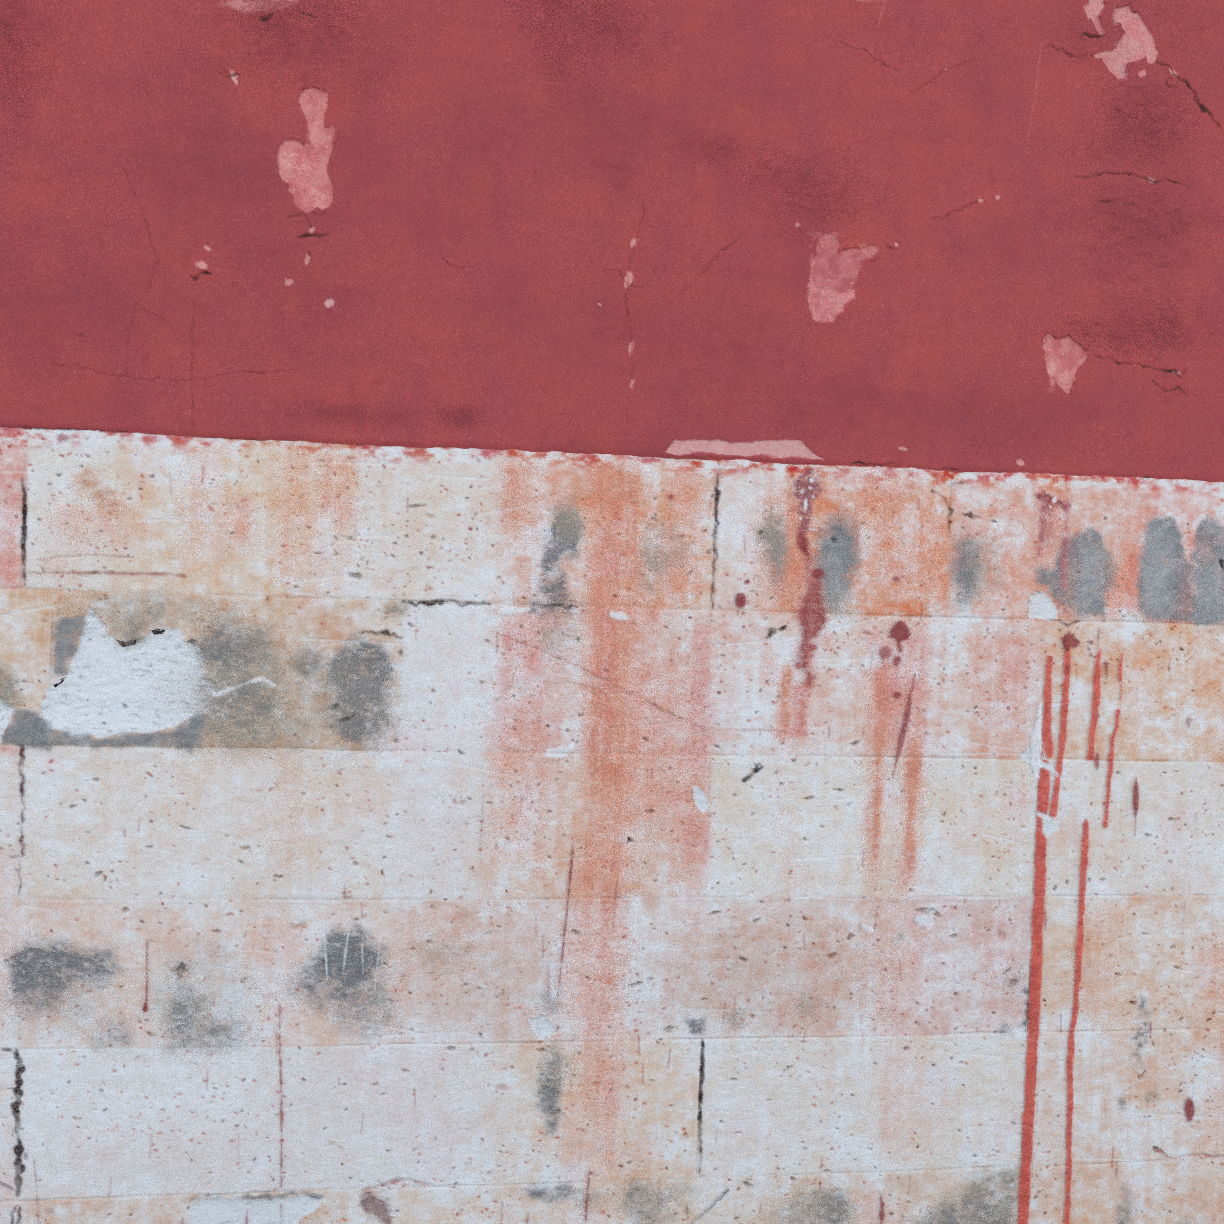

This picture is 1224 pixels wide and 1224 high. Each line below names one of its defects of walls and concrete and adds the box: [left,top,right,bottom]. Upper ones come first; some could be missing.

peeling [1083,0,1157,79]
crack [1162,64,1219,125]
peeling [278,84,339,233]
peeling [808,233,880,322]
peeling [667,440,820,459]
leakage [1038,529,1114,614]
leakage [1137,518,1224,625]
spalling [0,609,217,750]
leakage [193,619,392,749]
leakage [9,942,117,1009]
leakage [302,927,385,1010]
crack [4,1049,24,1224]